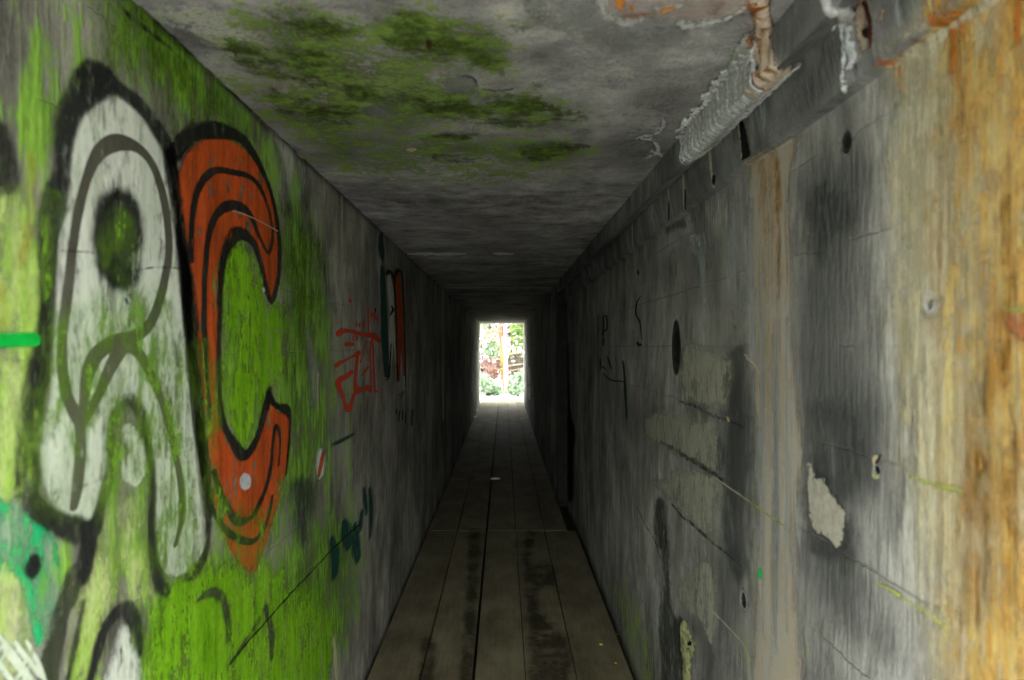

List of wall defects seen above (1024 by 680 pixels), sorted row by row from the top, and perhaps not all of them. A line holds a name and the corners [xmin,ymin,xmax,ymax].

water stain [636,0,864,680]
peeling [807,462,849,548]
corrosion [879,0,1024,680]